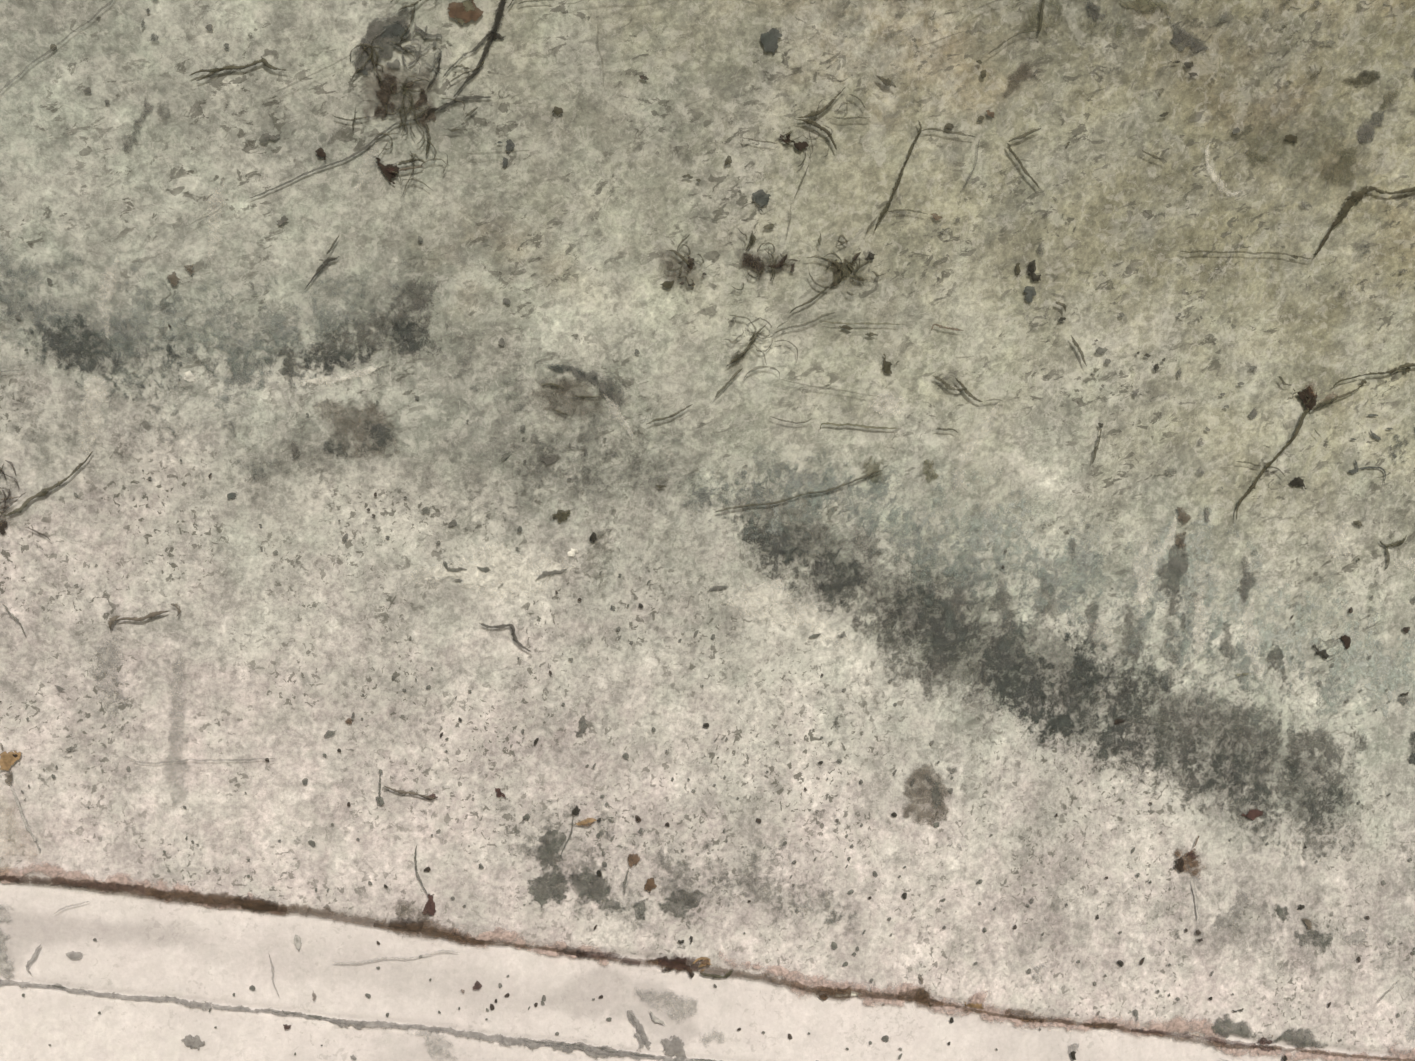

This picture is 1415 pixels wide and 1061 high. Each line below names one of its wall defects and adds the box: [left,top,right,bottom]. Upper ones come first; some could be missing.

crack [1181,186,1415,259]
crack [1236,363,1415,519]
leakage [698,468,1415,857]